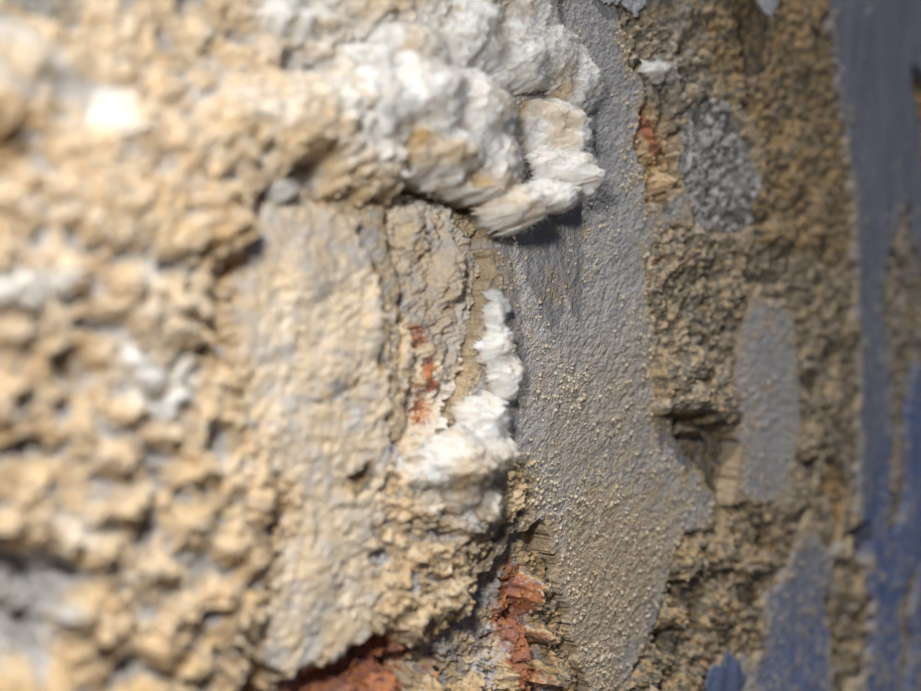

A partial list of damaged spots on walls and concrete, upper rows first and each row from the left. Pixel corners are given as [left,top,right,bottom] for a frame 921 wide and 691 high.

leakage [251,0,615,243]
leakage [401,285,530,529]
flaking render [599,0,870,691]
peeling [880,206,921,530]
flaking render [238,460,571,691]